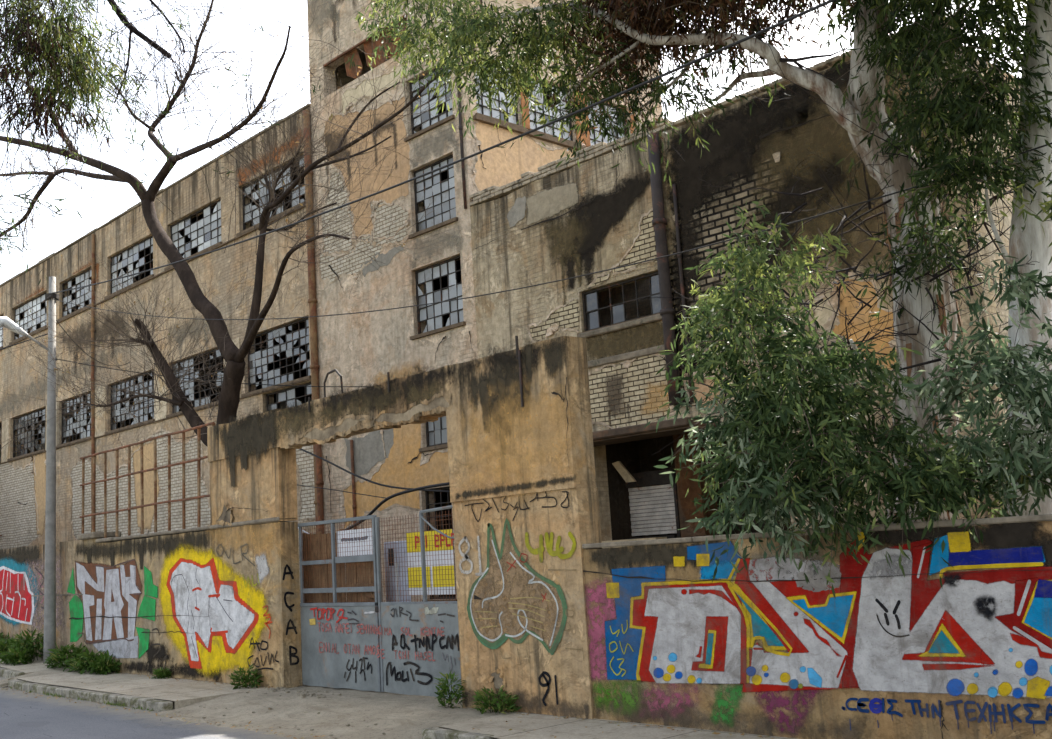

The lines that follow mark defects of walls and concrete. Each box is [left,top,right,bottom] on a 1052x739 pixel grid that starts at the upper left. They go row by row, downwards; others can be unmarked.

leakage [819,60,850,98]
leakage [884,35,938,165]
peeling [317,60,415,285]
leakage [526,172,651,305]
peeling [526,152,785,355]
leakage [586,84,890,404]
peeling [296,391,452,529]
leakage [214,337,569,487]
spalling [452,475,576,511]
peeling [588,353,676,429]
peeling [682,371,721,414]